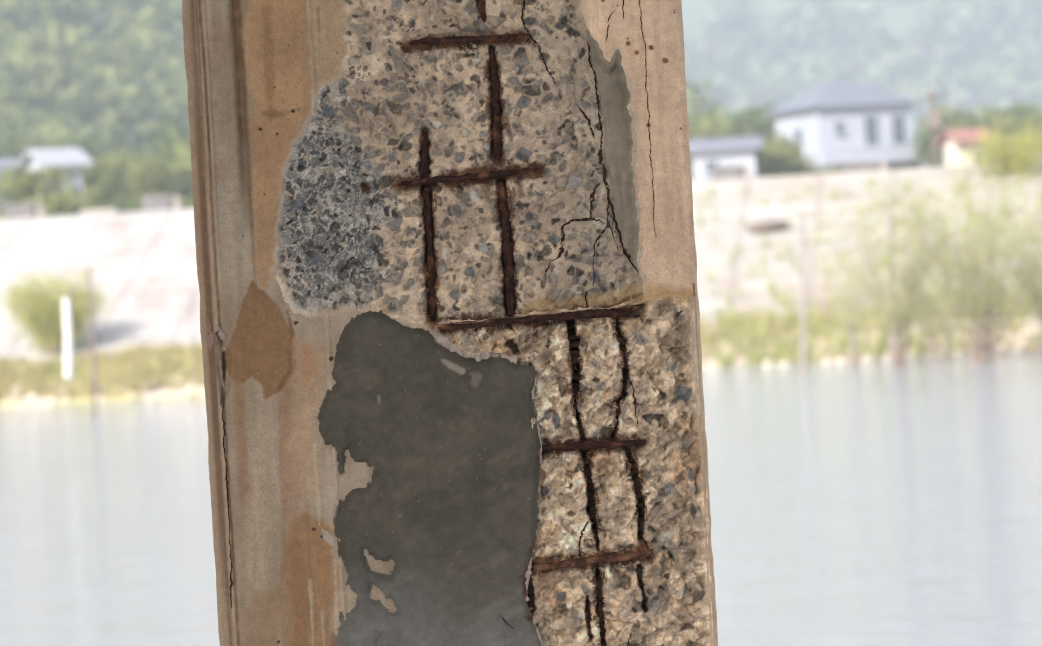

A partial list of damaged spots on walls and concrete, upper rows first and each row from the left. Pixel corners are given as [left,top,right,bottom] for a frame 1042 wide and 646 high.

spalling [275,0,714,646]
corrosion [356,23,695,646]
crack [521,0,555,83]
crack [544,0,656,646]